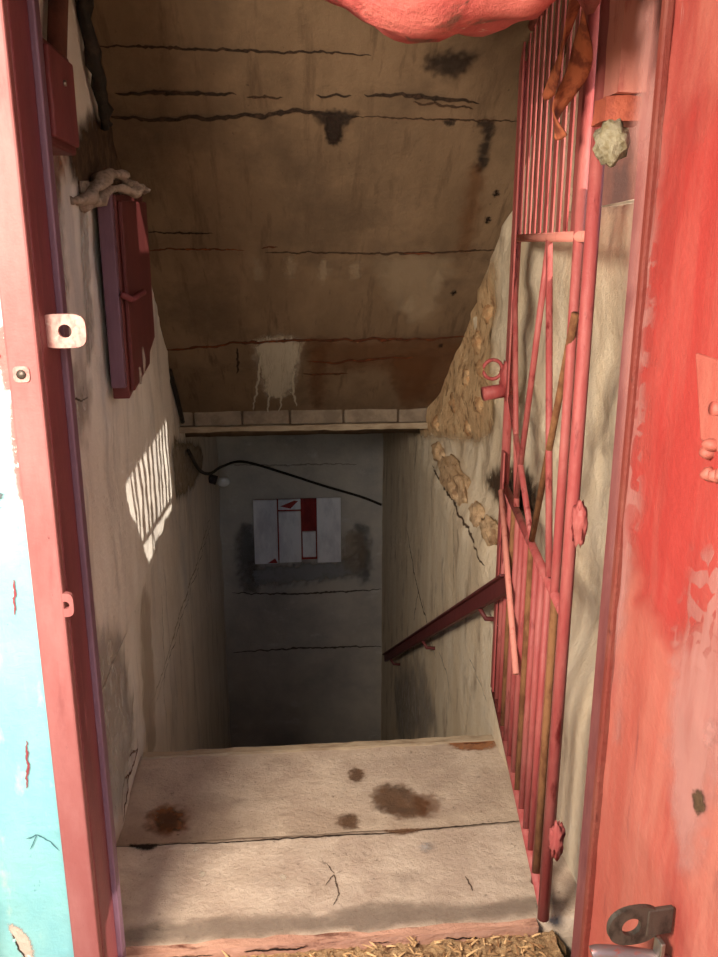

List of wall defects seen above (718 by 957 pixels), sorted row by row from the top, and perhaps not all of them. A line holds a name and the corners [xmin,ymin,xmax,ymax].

crack [100,44,371,56]
crack [111,90,517,145]
water stain [476,121,494,172]
water stain [253,337,299,412]
flaking render [419,265,496,441]
crack [433,467,484,579]
water stain [146,806,186,834]
water stain [374,784,429,818]